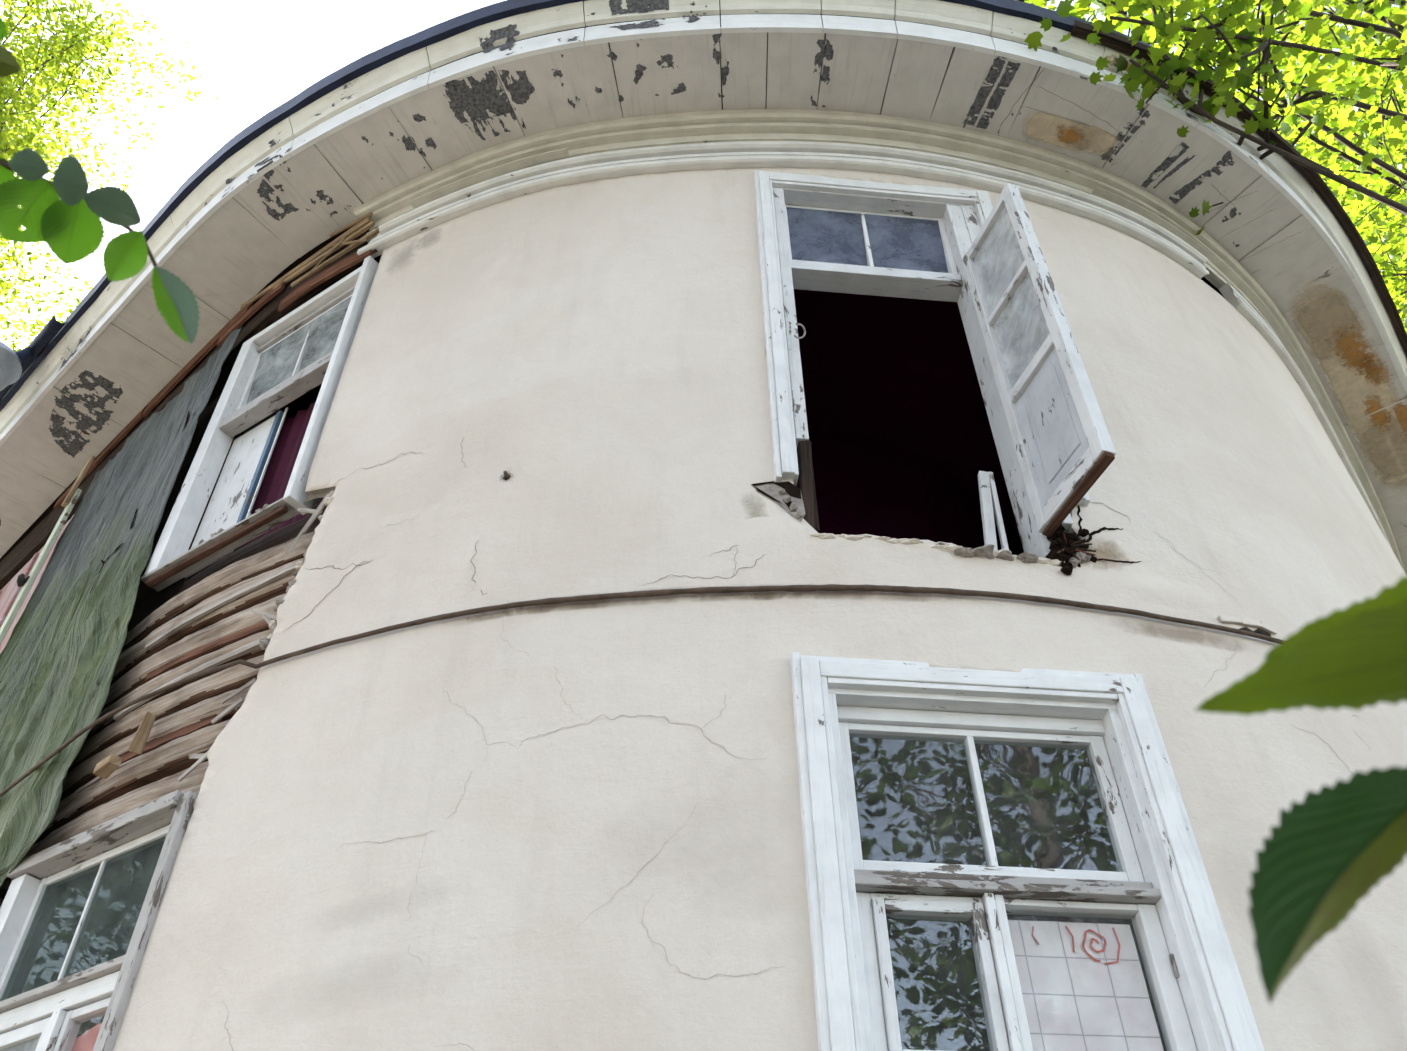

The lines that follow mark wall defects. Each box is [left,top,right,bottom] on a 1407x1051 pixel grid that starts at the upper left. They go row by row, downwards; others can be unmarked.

peeling [443,24,535,140]
peeling [588,0,707,96]
peeling [813,39,834,84]
peeling [963,55,1021,136]
water stain [1026,113,1115,154]
peeling [49,326,123,458]
water stain [1294,288,1407,485]
spalling [752,481,1097,575]
spalling [211,490,335,724]
crack [283,560,373,634]
crack [338,540,767,963]
crack [580,804,783,980]